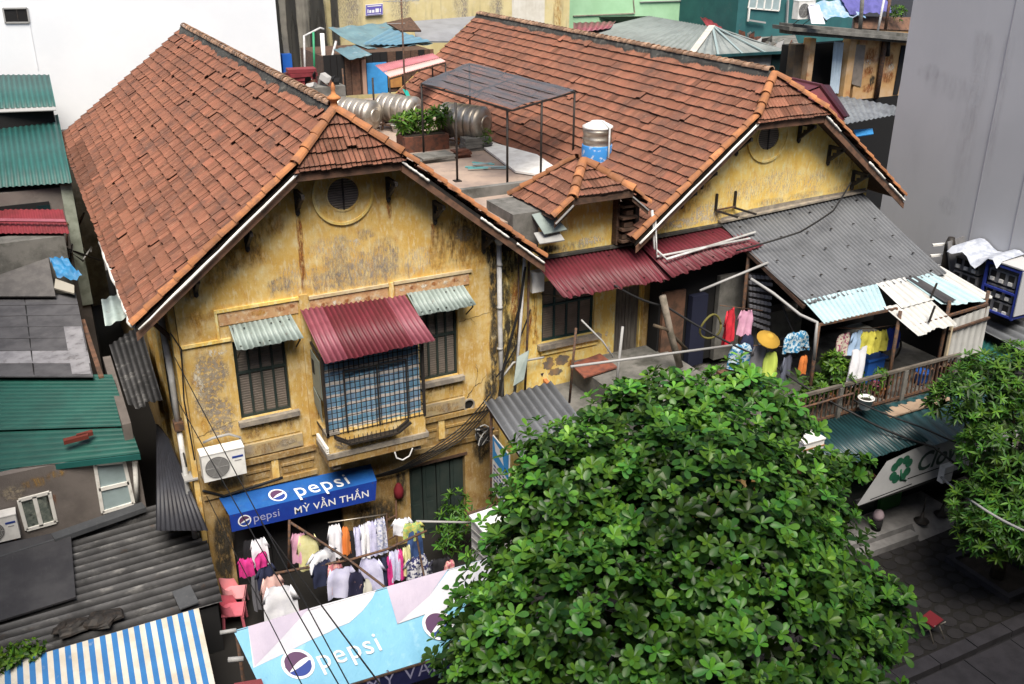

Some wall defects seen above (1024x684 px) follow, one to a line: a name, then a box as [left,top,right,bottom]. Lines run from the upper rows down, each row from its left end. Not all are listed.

damp [405,217,523,400]
peeling [194,350,233,435]
spalling [543,355,575,376]